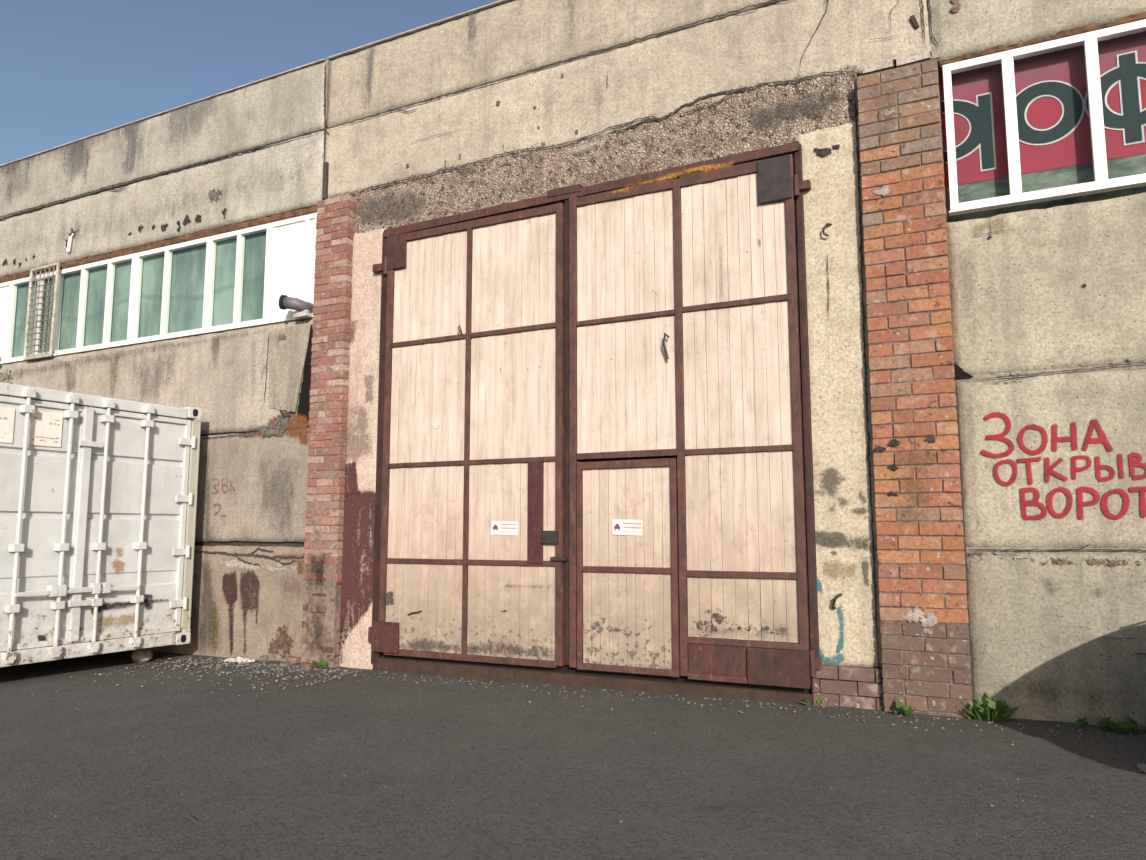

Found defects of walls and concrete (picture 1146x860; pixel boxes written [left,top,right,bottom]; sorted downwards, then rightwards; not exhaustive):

crack [870,0,939,45]
crack [0,0,788,217]
spalling [328,65,858,234]
spalling [128,214,201,235]
crack [195,547,305,566]